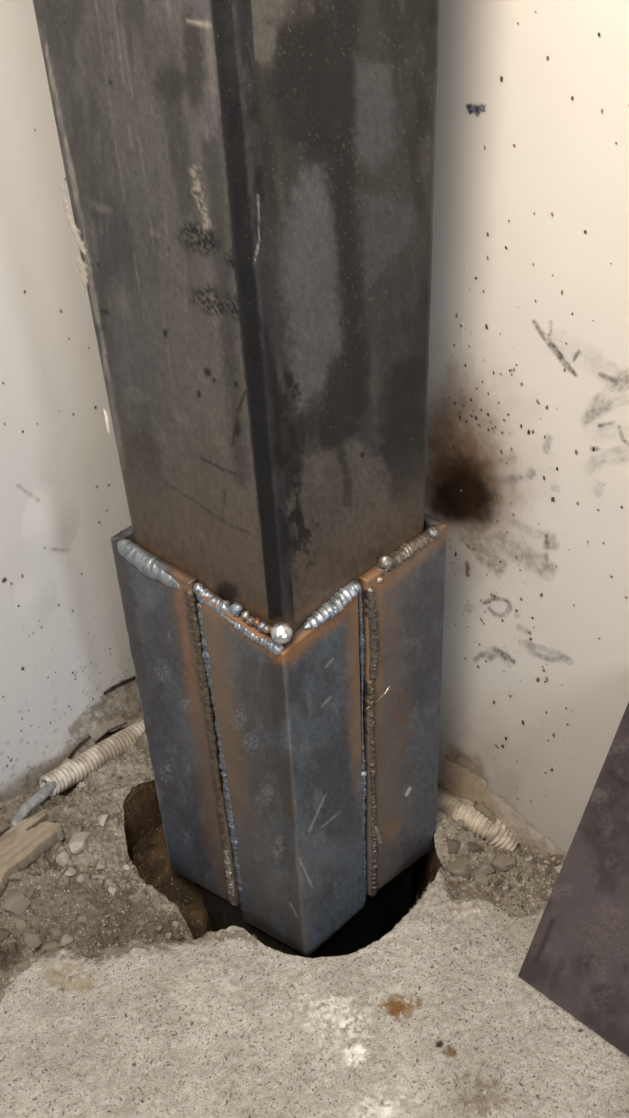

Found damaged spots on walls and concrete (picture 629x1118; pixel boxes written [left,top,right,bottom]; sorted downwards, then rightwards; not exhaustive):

flaking render [60,676,143,766]
peeling [438,753,567,856]
spalling [409,883,439,920]
spalling [448,899,482,923]
spalling [0,930,258,1001]
rust [381,996,421,1020]